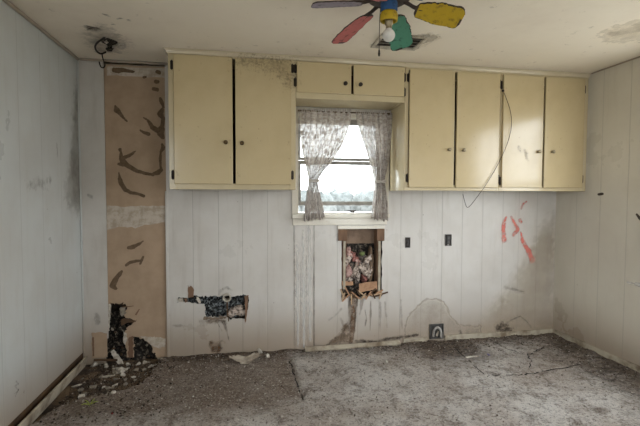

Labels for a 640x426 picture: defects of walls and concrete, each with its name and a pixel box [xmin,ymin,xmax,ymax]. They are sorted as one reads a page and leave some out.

spalling [338,225,388,305]
spalling [91,304,166,364]
spalling [177,286,249,322]
leakage [333,297,376,344]
crack [457,339,580,376]